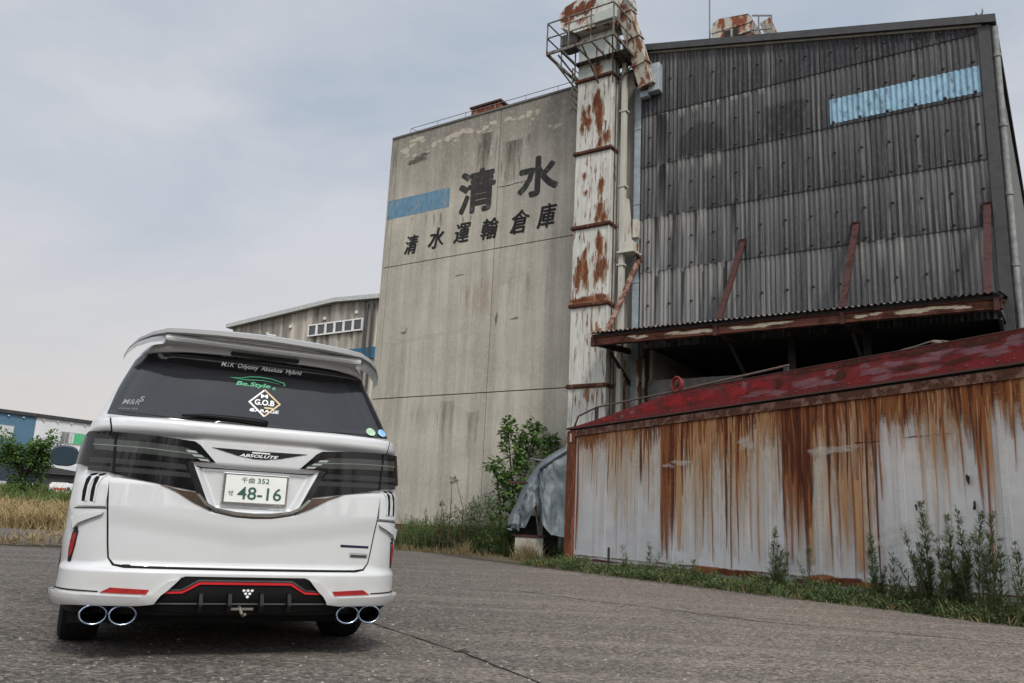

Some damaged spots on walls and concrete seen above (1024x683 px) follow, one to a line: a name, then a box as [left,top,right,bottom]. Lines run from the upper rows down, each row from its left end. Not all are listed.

rust [560,0,596,23]
peeling [400,109,541,157]
rust [580,88,611,148]
rust [570,172,611,355]
peeling [731,321,793,329]
peeling [895,305,971,315]
rust [575,378,1024,591]